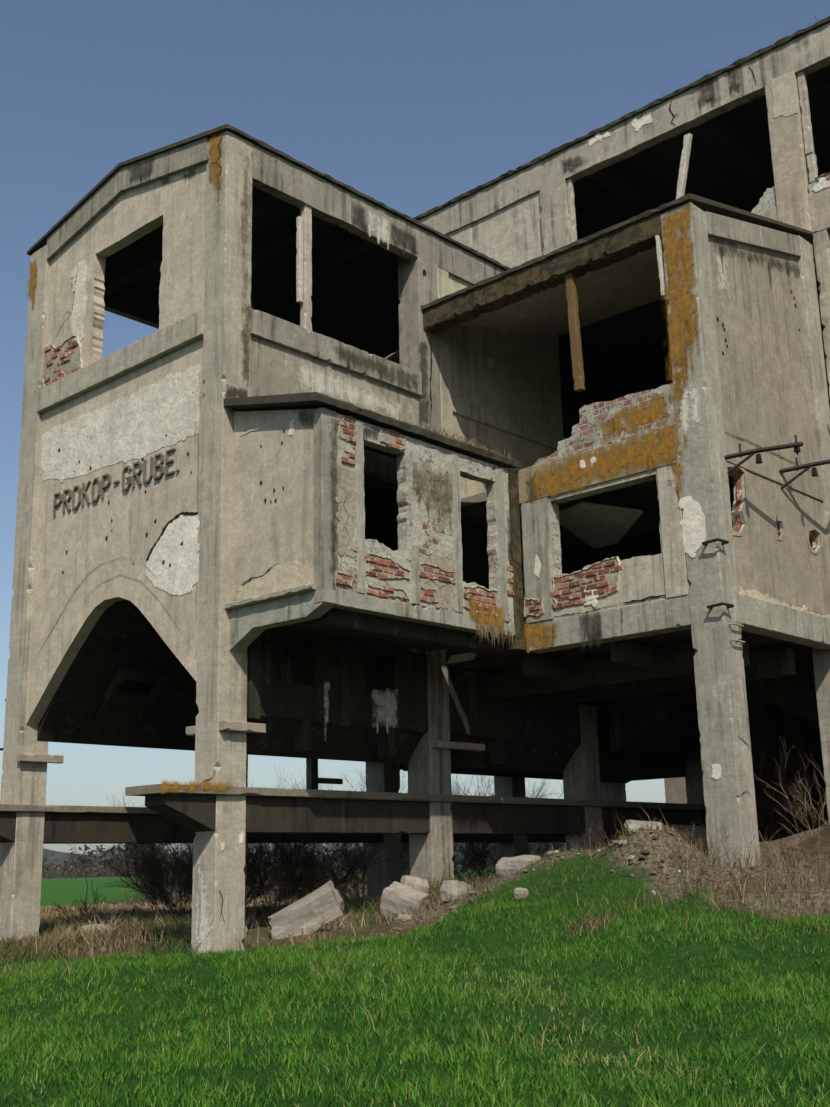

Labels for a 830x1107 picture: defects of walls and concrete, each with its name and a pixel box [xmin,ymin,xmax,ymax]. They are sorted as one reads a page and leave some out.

corrosion [209,133,222,201]
flaking render [813,173,830,192]
corrosion [27,260,37,309]
flaking render [43,259,87,387]
corrosion [530,203,698,509]
flaking render [132,512,200,596]
flaking render [334,415,623,618]
flaking render [678,496,706,558]
corrosion [470,597,504,629]
damp [372,690,397,733]